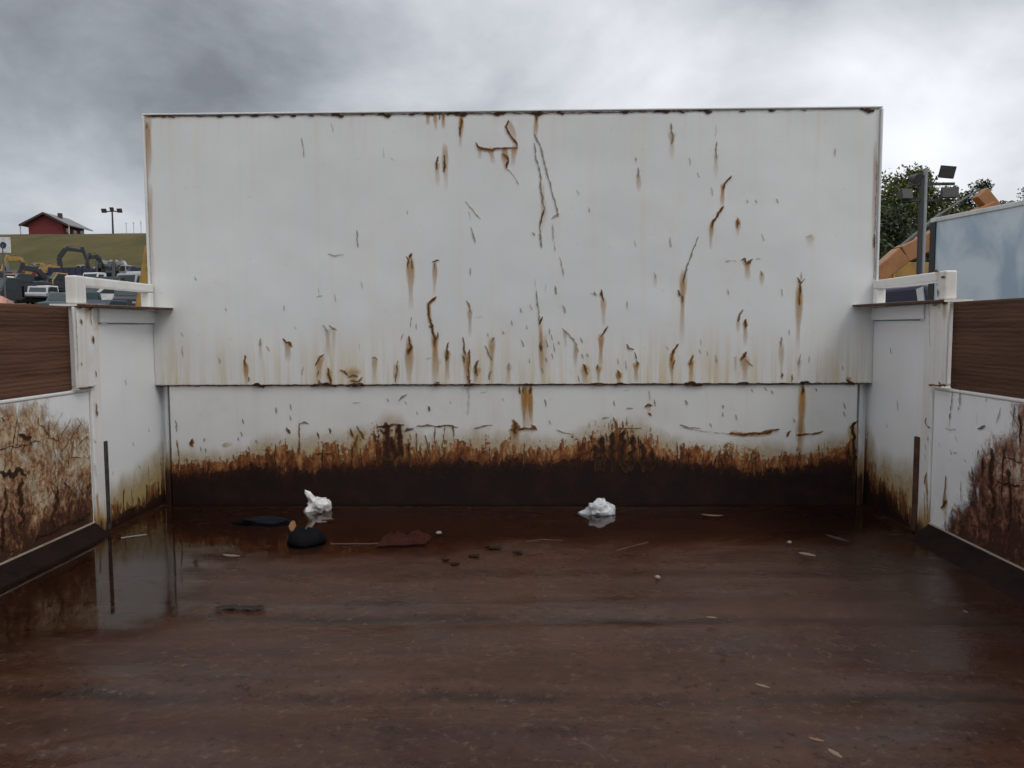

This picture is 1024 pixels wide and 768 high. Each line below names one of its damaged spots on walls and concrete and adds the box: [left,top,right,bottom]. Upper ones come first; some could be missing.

corrosion [710,175,732,233]
corrosion [427,297,439,358]
corrosion [311,354,364,387]
corrosion [462,337,479,387]
corrosion [97,381,928,528]